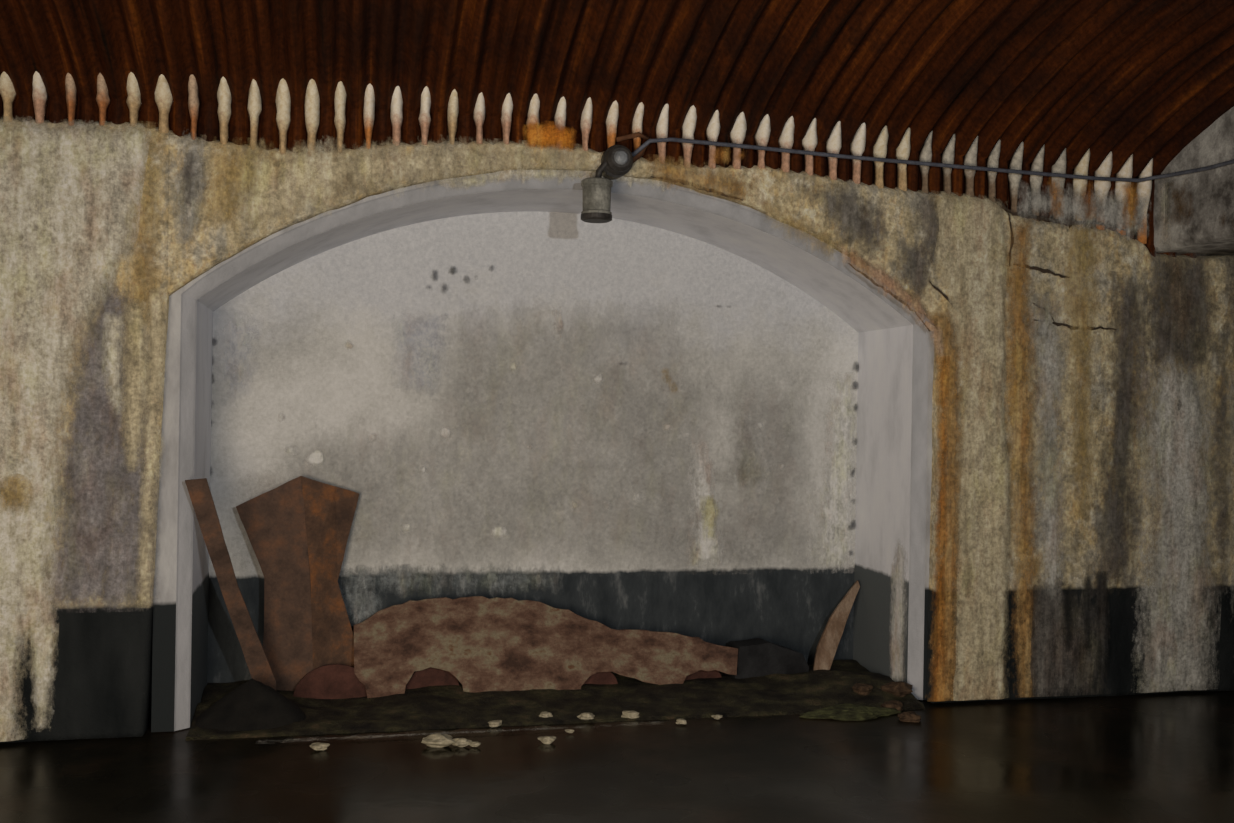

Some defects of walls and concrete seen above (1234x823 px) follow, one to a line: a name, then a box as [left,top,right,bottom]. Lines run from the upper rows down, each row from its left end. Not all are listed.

damp [0,121,165,742]
damp [824,192,882,249]
rust [933,313,960,702]
rust [1005,224,1037,697]
crack [994,197,1124,278]
crack [1033,303,1116,330]
damp [1019,183,1234,697]